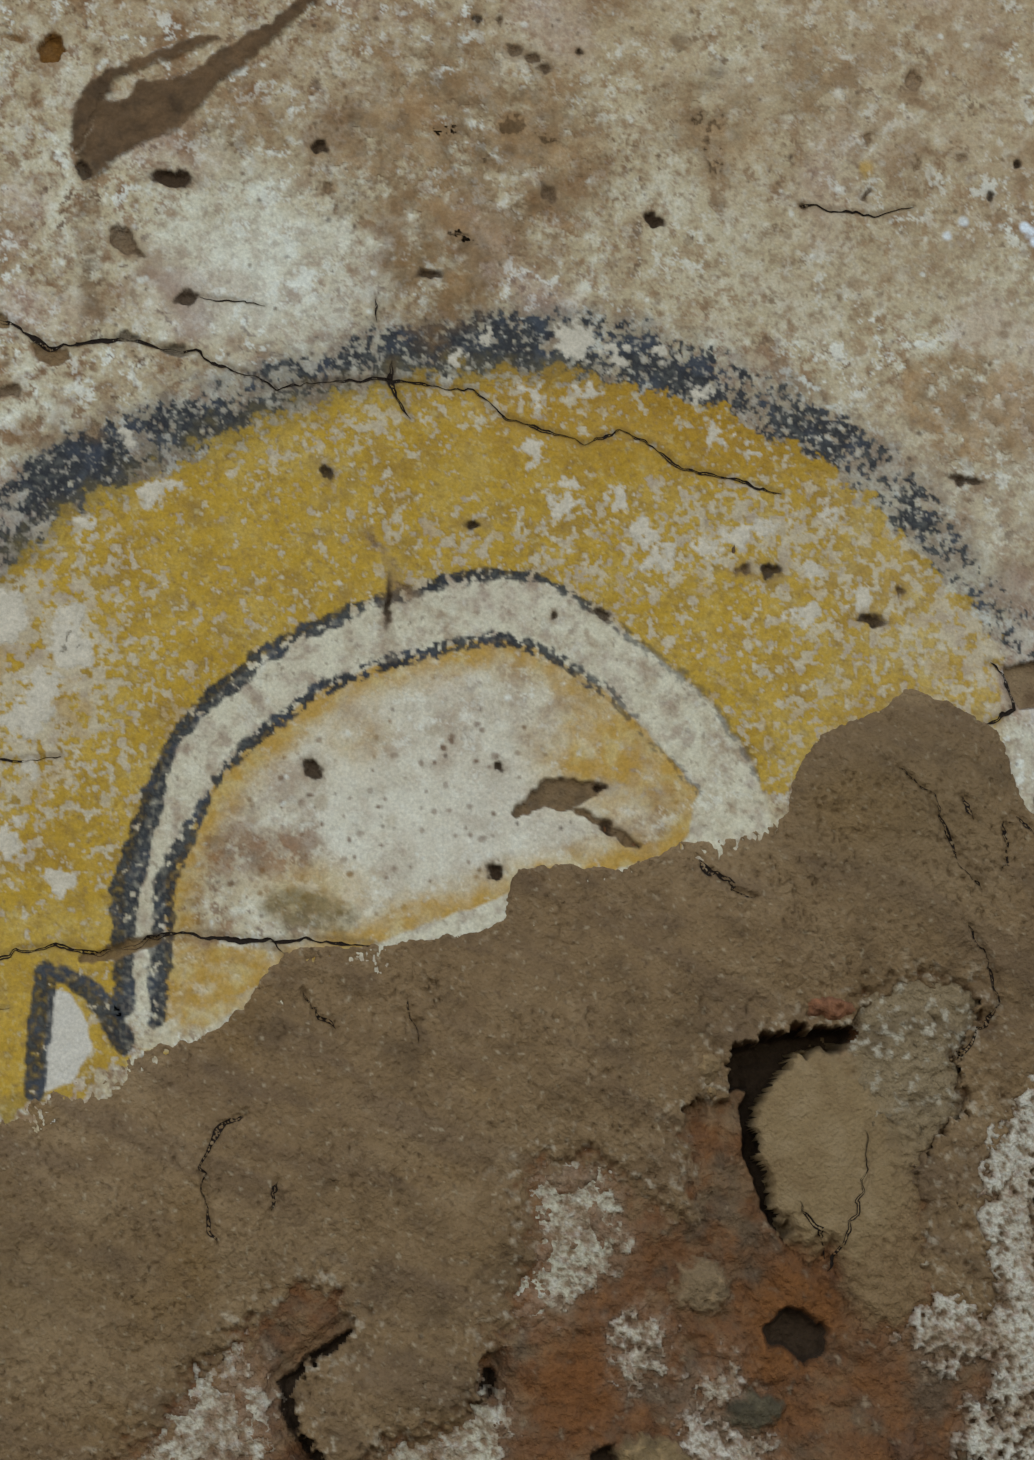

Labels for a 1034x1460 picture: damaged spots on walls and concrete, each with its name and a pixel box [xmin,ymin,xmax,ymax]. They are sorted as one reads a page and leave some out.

crack [201,297,263,306]
crack [1,320,782,495]
peeling [0,600,105,738]
spalling [303,760,323,780]
spalling [512,778,641,849]
peeling [44,866,77,899]
spalling [485,864,502,881]
crack [0,931,370,960]
crack [303,993,336,1029]
flaking render [725,979,982,1335]
spalling [763,1308,826,1362]
spalling [276,1330,352,1460]